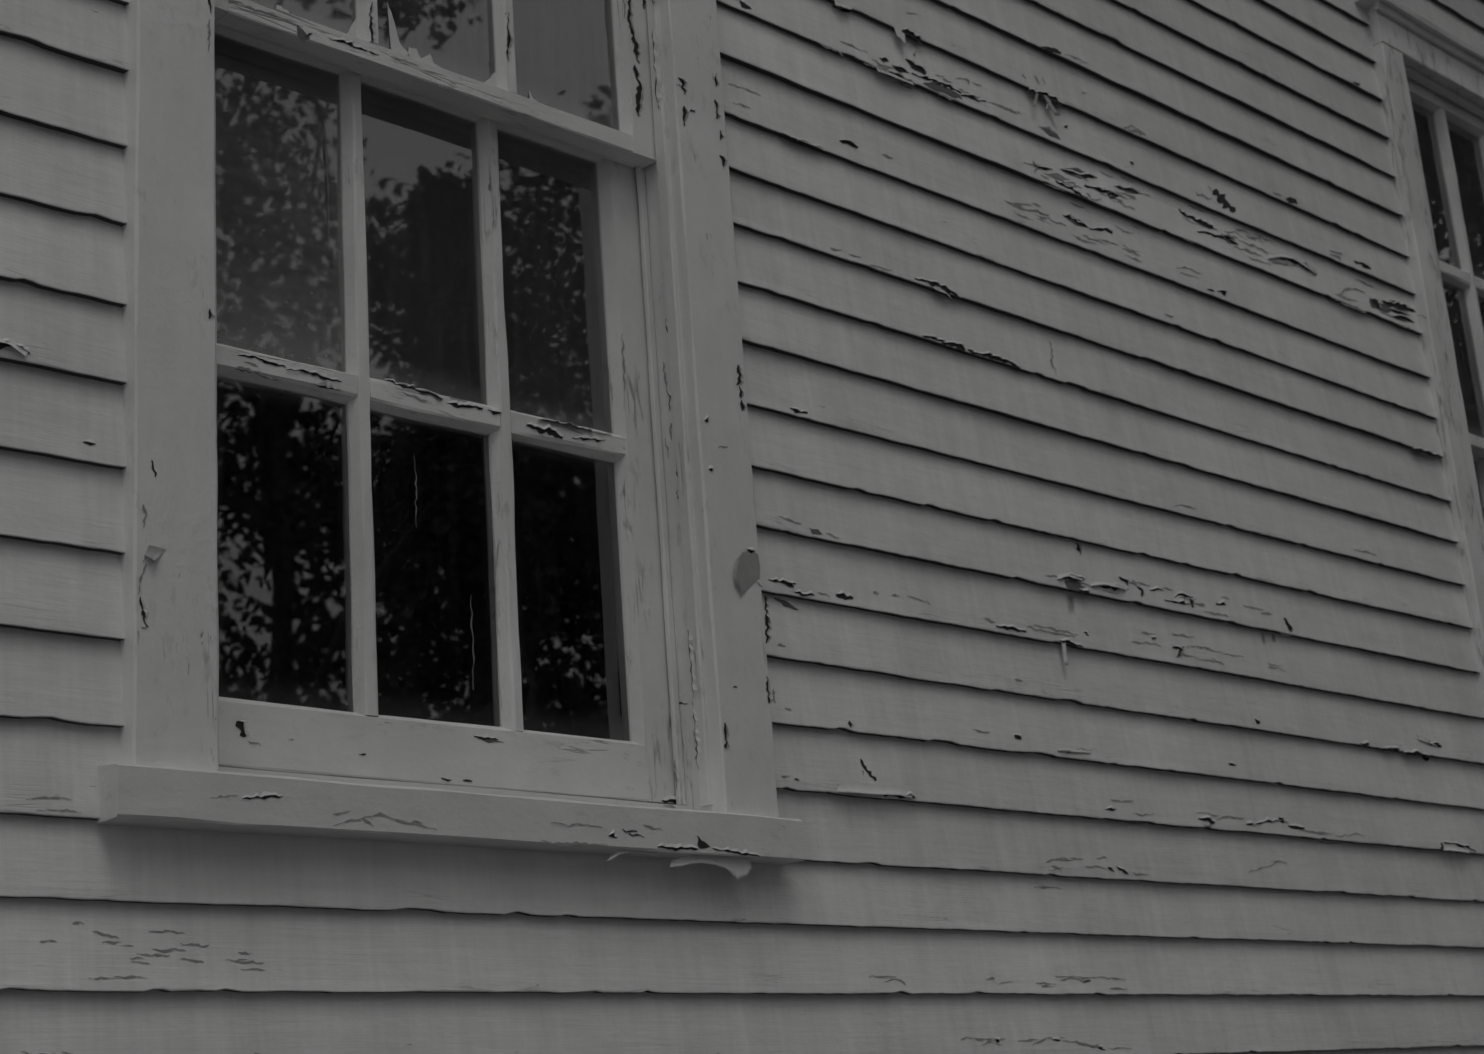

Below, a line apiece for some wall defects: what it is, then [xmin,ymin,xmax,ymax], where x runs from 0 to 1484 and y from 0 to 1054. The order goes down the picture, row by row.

spalling [207,0,418,66]
peeling [822,12,1021,114]
peeling [782,129,859,151]
peeling [1329,250,1428,328]
peeling [0,335,31,357]
peeling [235,352,343,390]
peeling [384,379,501,415]
peeling [526,418,612,442]
peeling [734,547,854,647]
peeling [1046,571,1293,636]
peeling [985,618,1089,666]
spalling [474,734,504,743]